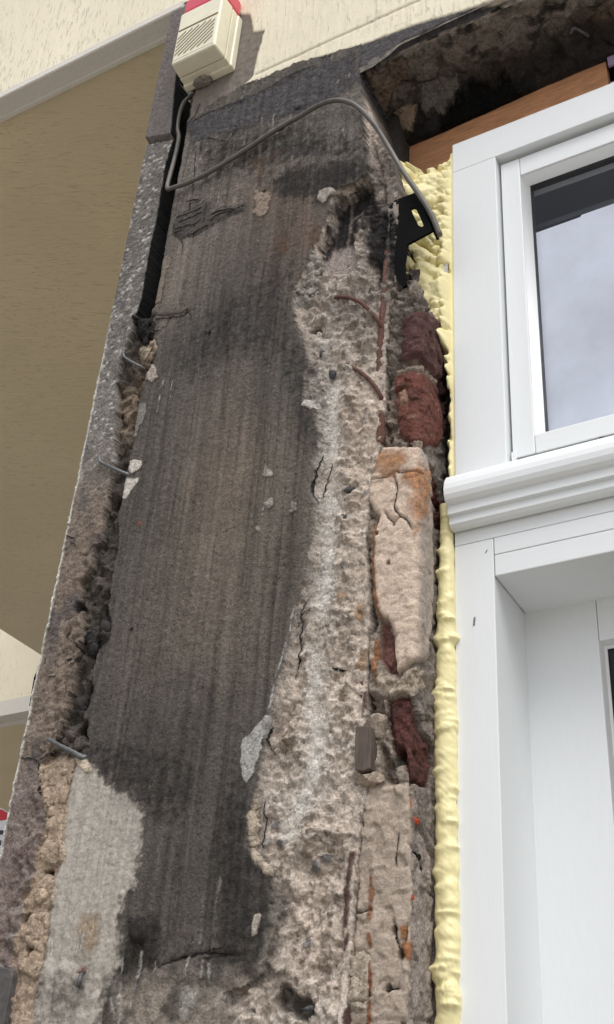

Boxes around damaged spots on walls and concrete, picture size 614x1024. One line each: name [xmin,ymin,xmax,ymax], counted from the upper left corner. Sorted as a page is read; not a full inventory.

spalling [393,73,460,132]
peeling [134,403,147,438]
peeling [122,459,142,499]
crack [311,454,333,504]
crack [373,472,412,530]
rust [375,450,431,534]
spalling [221,92,407,1024]
crack [296,601,310,675]
flaking render [32,759,144,1024]
leakage [184,876,222,978]
leakage [179,988,198,1020]